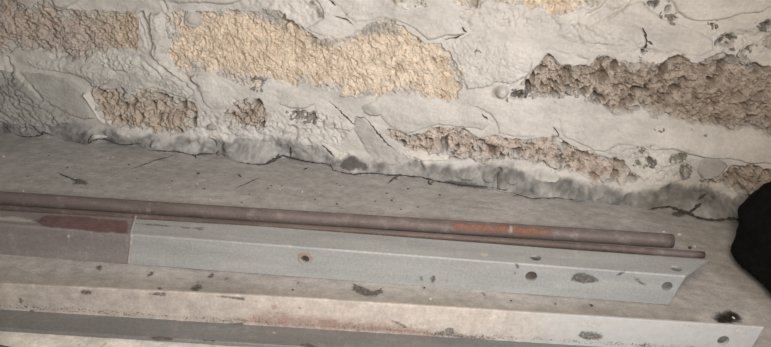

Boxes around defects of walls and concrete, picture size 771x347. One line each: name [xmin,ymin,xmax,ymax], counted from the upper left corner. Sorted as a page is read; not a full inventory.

spalling [506,82,528,102]
peeling [82,91,112,124]
crack [81,134,220,170]
peeling [404,148,449,163]
crack [240,145,577,200]
peeling [529,169,559,182]
crack [647,194,738,222]